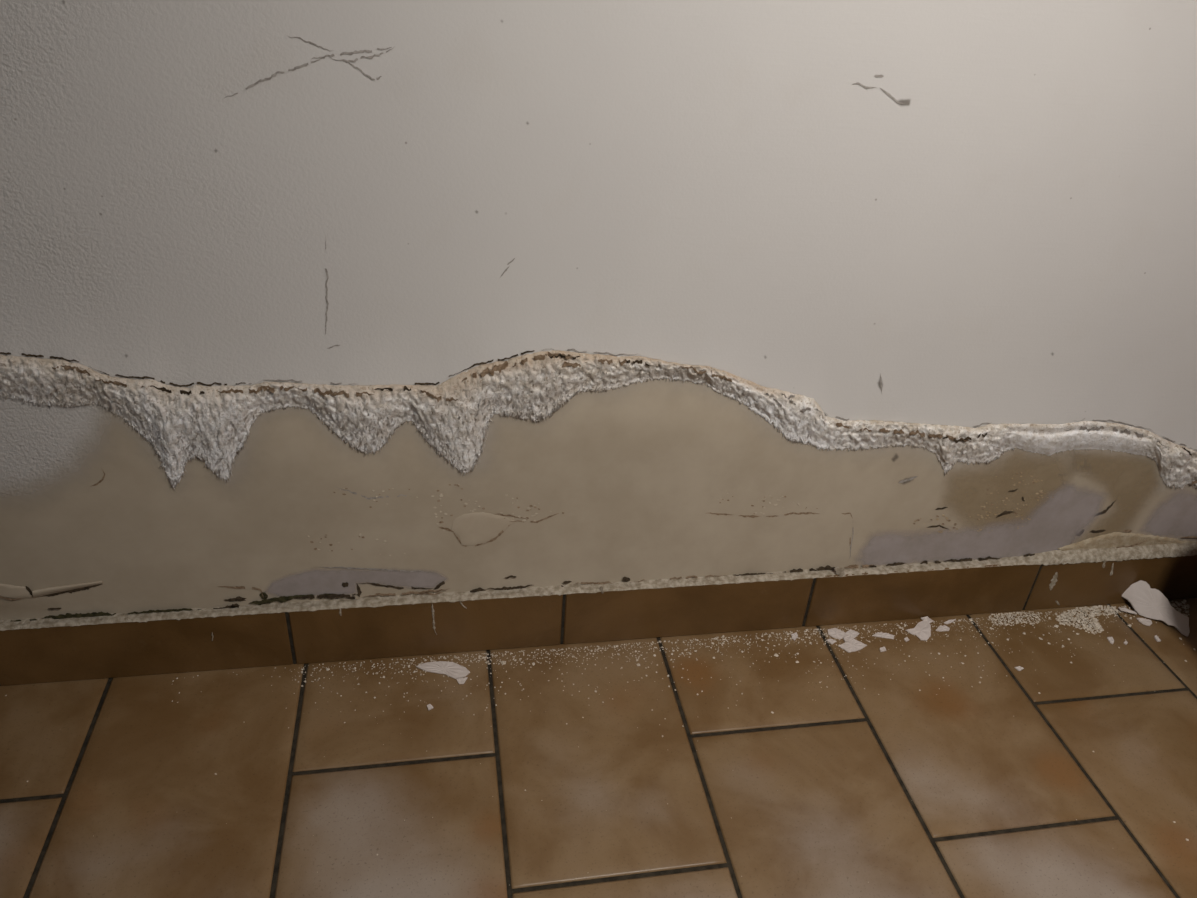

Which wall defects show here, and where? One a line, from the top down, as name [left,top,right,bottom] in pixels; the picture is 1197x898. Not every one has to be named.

crack [225,37,394,98]
peeling [0,349,1197,533]
water stain [0,378,1197,620]
peeling [0,581,103,601]
peeling [217,534,445,602]
peeling [826,628,886,653]
peeling [921,616,950,632]
peeling [1058,529,1197,551]
peeling [1118,580,1190,642]
peeling [416,661,470,684]